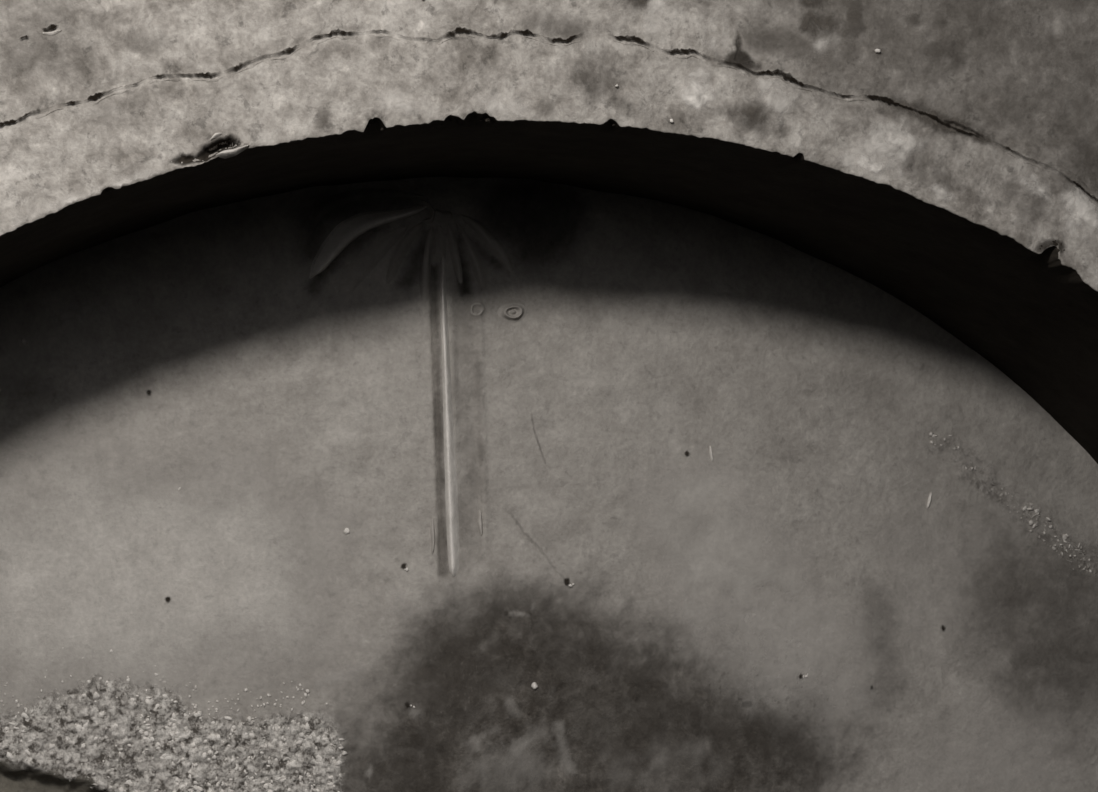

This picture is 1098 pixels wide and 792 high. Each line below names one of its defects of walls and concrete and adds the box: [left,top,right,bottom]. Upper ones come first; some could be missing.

crack [20,24,62,39]
flaking render [170,133,250,165]
crack [0,27,583,127]
crack [614,35,1098,203]